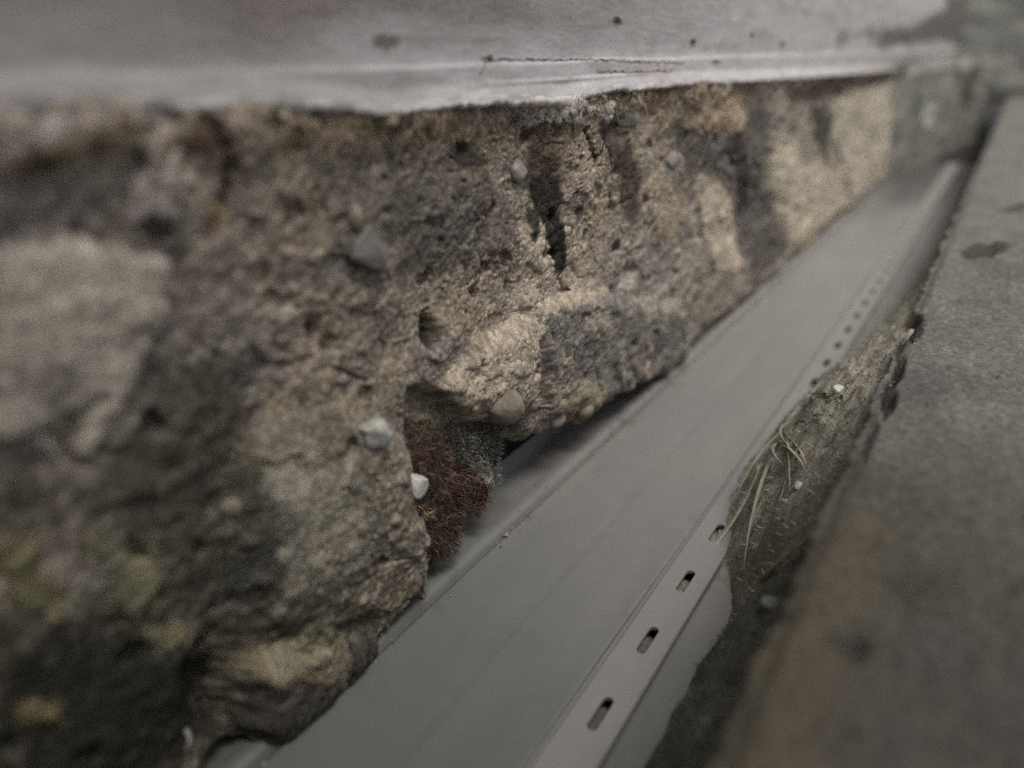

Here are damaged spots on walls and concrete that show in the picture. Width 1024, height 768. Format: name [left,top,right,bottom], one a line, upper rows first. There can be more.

peeling [499,94,616,130]
spalling [697,92,748,131]
spalling [765,79,893,251]
spalling [650,180,679,243]
spalling [693,174,745,276]
spalling [418,289,475,346]
spalling [440,207,609,414]
spalling [258,436,385,602]
spalling [144,620,189,651]
spalling [201,633,353,691]